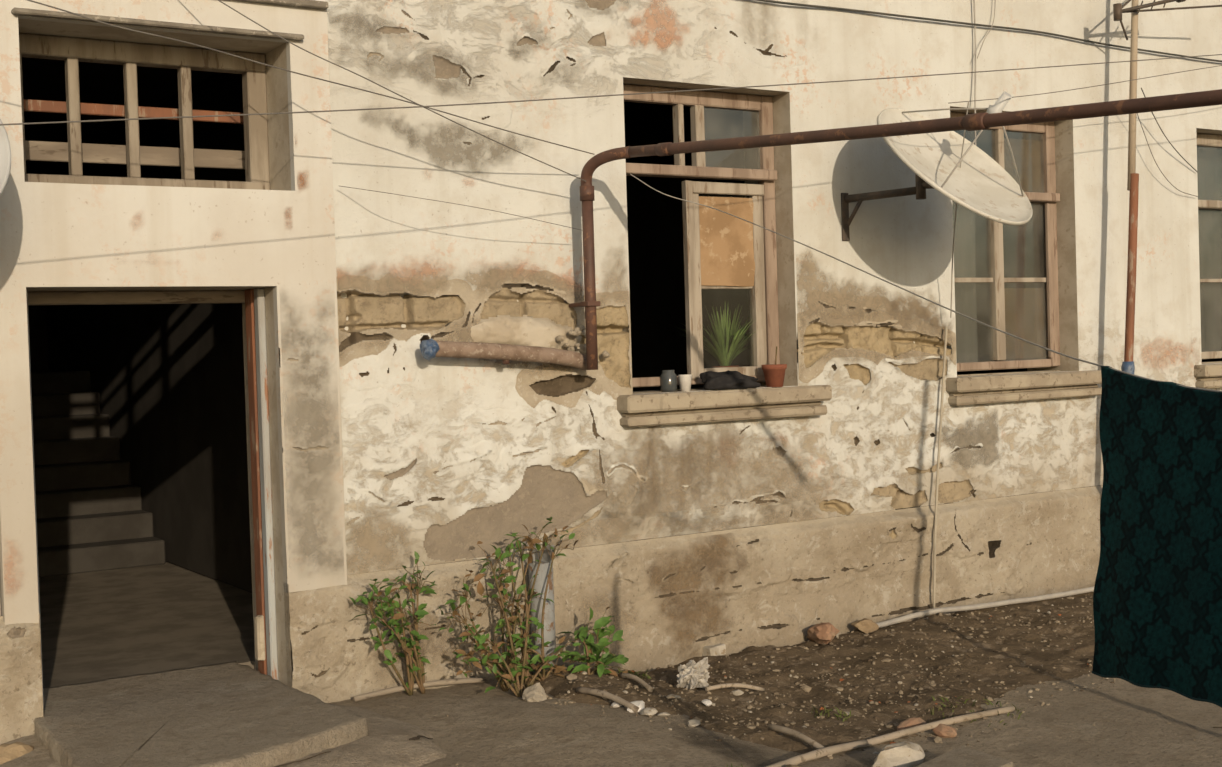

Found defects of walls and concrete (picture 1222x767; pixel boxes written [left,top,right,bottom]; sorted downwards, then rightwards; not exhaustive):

spalling [358,0,471,97]
spalling [500,0,681,61]
spalling [797,316,956,394]
spalling [279,263,633,566]
flaking render [761,432,797,471]
spalling [808,403,978,520]
leakage [652,517,735,641]